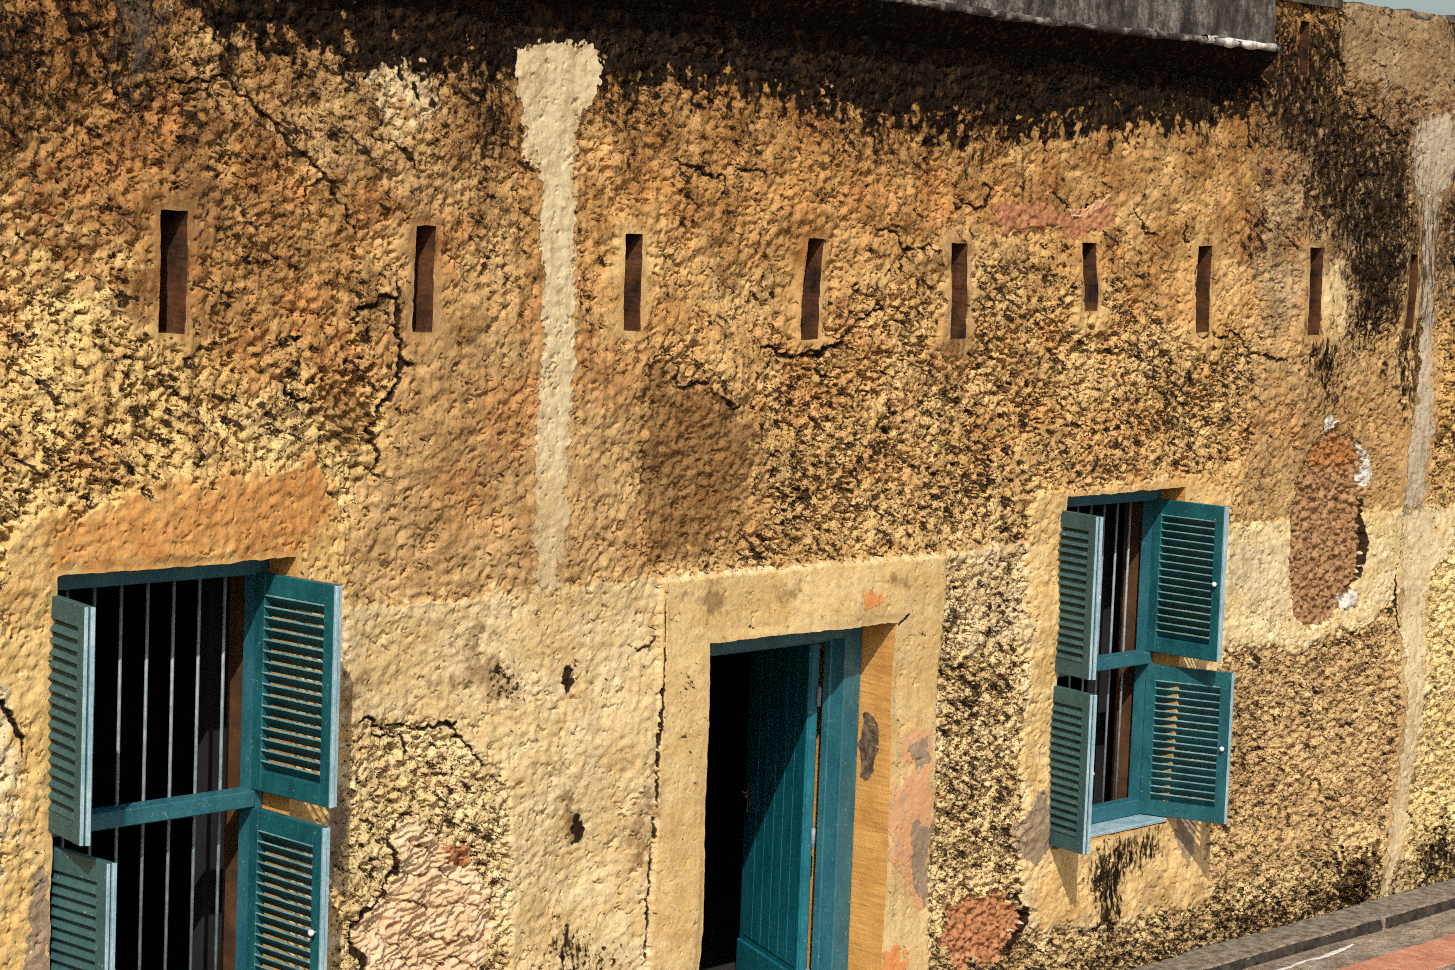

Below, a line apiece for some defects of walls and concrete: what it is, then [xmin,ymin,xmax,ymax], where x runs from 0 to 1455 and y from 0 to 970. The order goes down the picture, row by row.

crack [60,0,357,260]
crack [371,134,419,180]
crack [349,266,414,469]
flaking render [1288,413,1372,632]
damp [561,665,575,694]
crack [0,699,25,758]
peeling [857,712,879,781]
damp [570,813,585,845]
flaking render [345,813,497,970]
damp [523,915,631,970]
flaking render [935,887,1030,970]
damp [1204,898,1455,970]